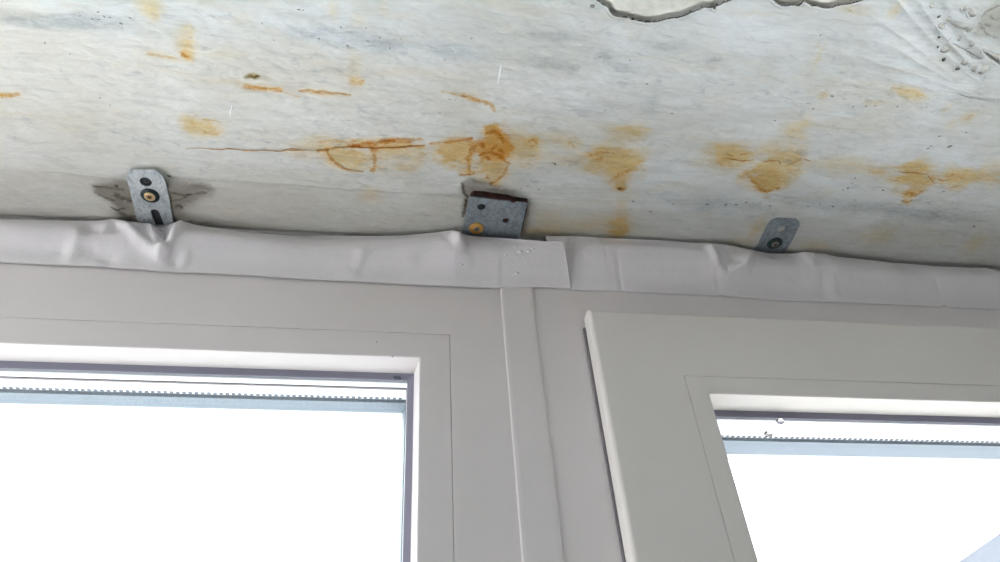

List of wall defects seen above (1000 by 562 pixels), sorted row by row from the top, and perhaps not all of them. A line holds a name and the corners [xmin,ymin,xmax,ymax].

spalling [590,0,735,25]